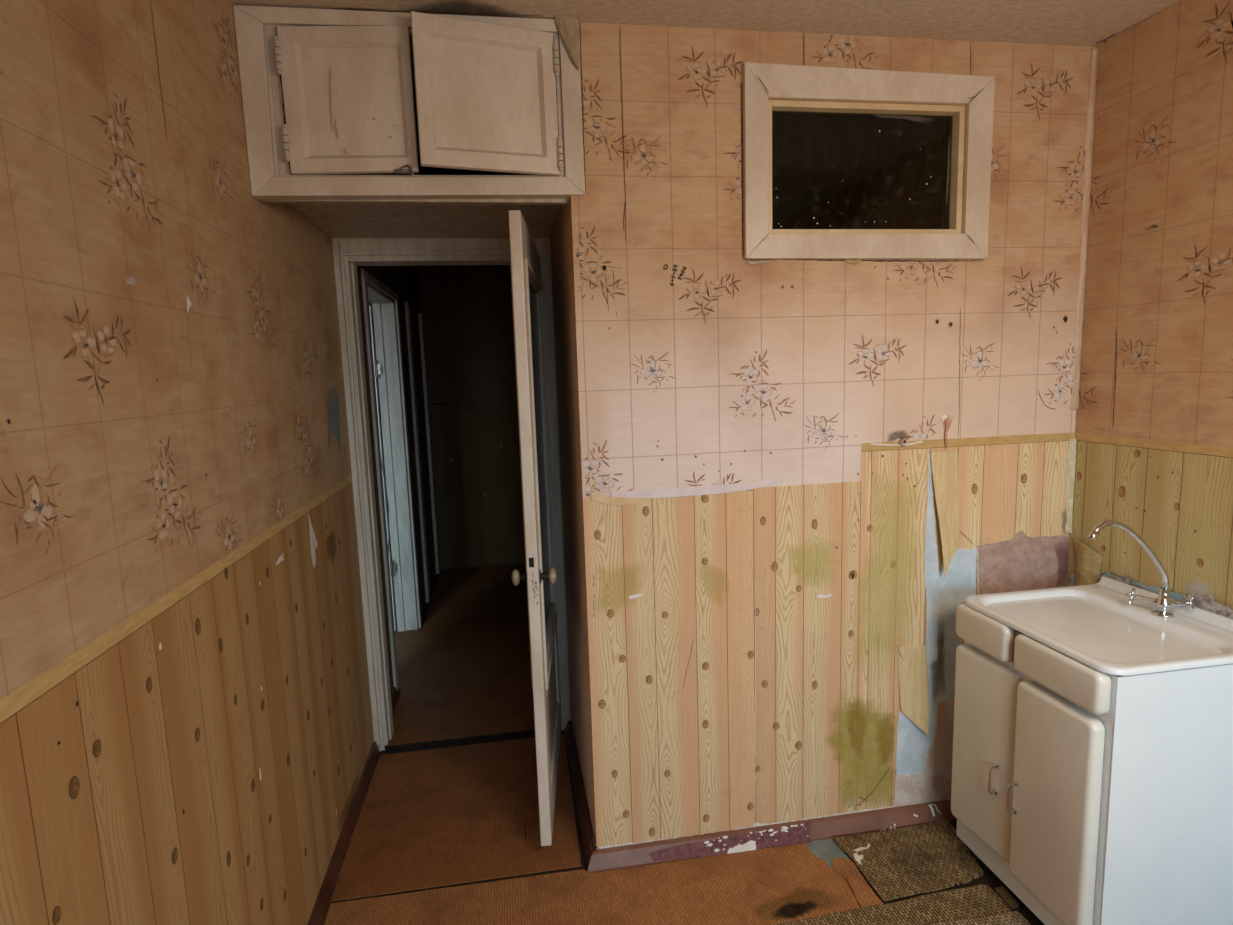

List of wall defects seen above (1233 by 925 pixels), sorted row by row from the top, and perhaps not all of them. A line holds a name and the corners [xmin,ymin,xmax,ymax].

flaking render [1098,571,1233,619]
flaking render [597,448,979,869]
water stain [833,710,892,810]